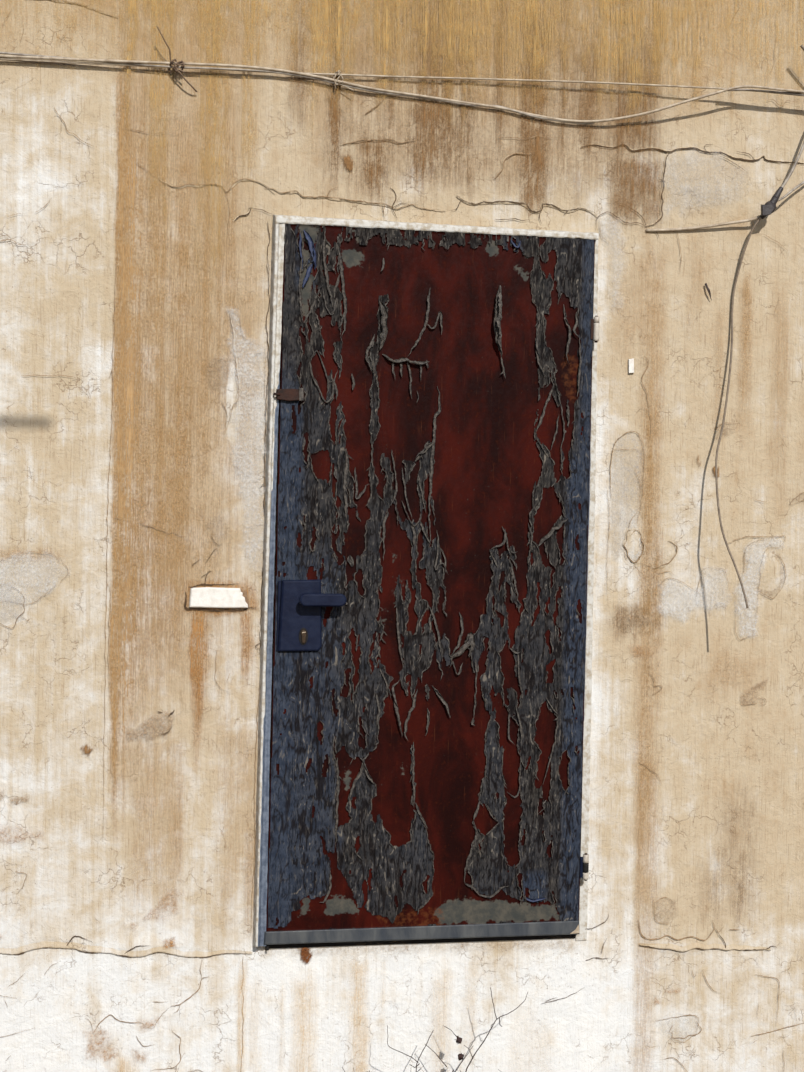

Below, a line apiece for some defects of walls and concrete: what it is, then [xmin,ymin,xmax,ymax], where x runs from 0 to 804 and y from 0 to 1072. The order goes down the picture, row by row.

crack [335,94,415,149]
damp [195,0,804,233]
crack [103,259,185,829]
damp [109,89,184,767]
peeling [228,221,607,929]
crack [135,135,804,657]
crack [0,684,260,1072]
corrosion [301,947,312,964]